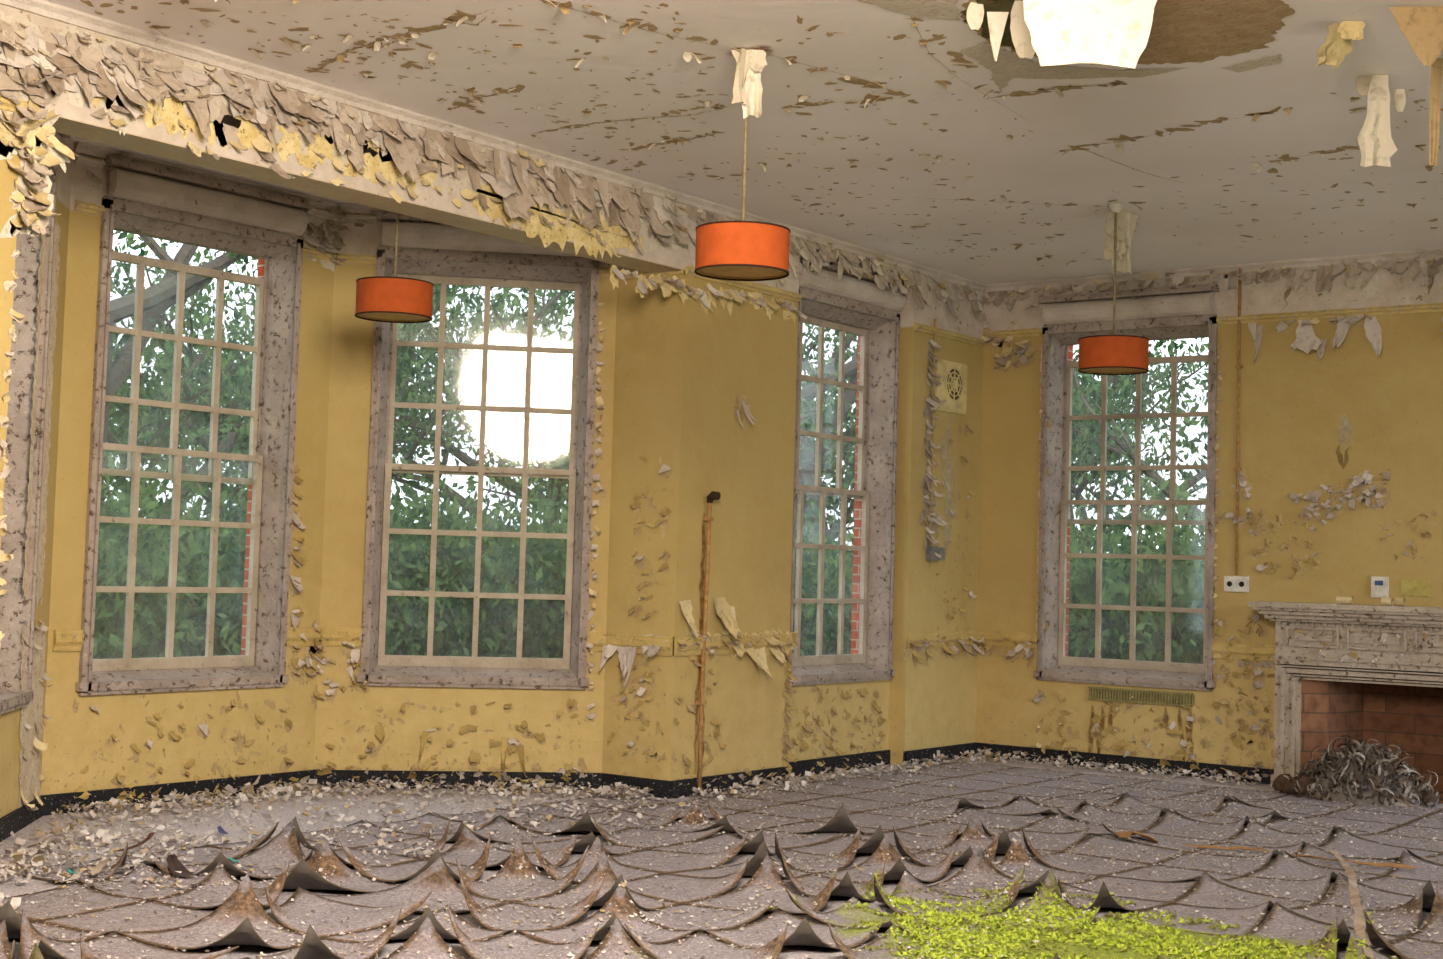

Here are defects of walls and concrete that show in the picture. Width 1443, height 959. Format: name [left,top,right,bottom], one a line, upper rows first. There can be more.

spalling [0,0,1443,605]
peeling [0,303,1443,959]